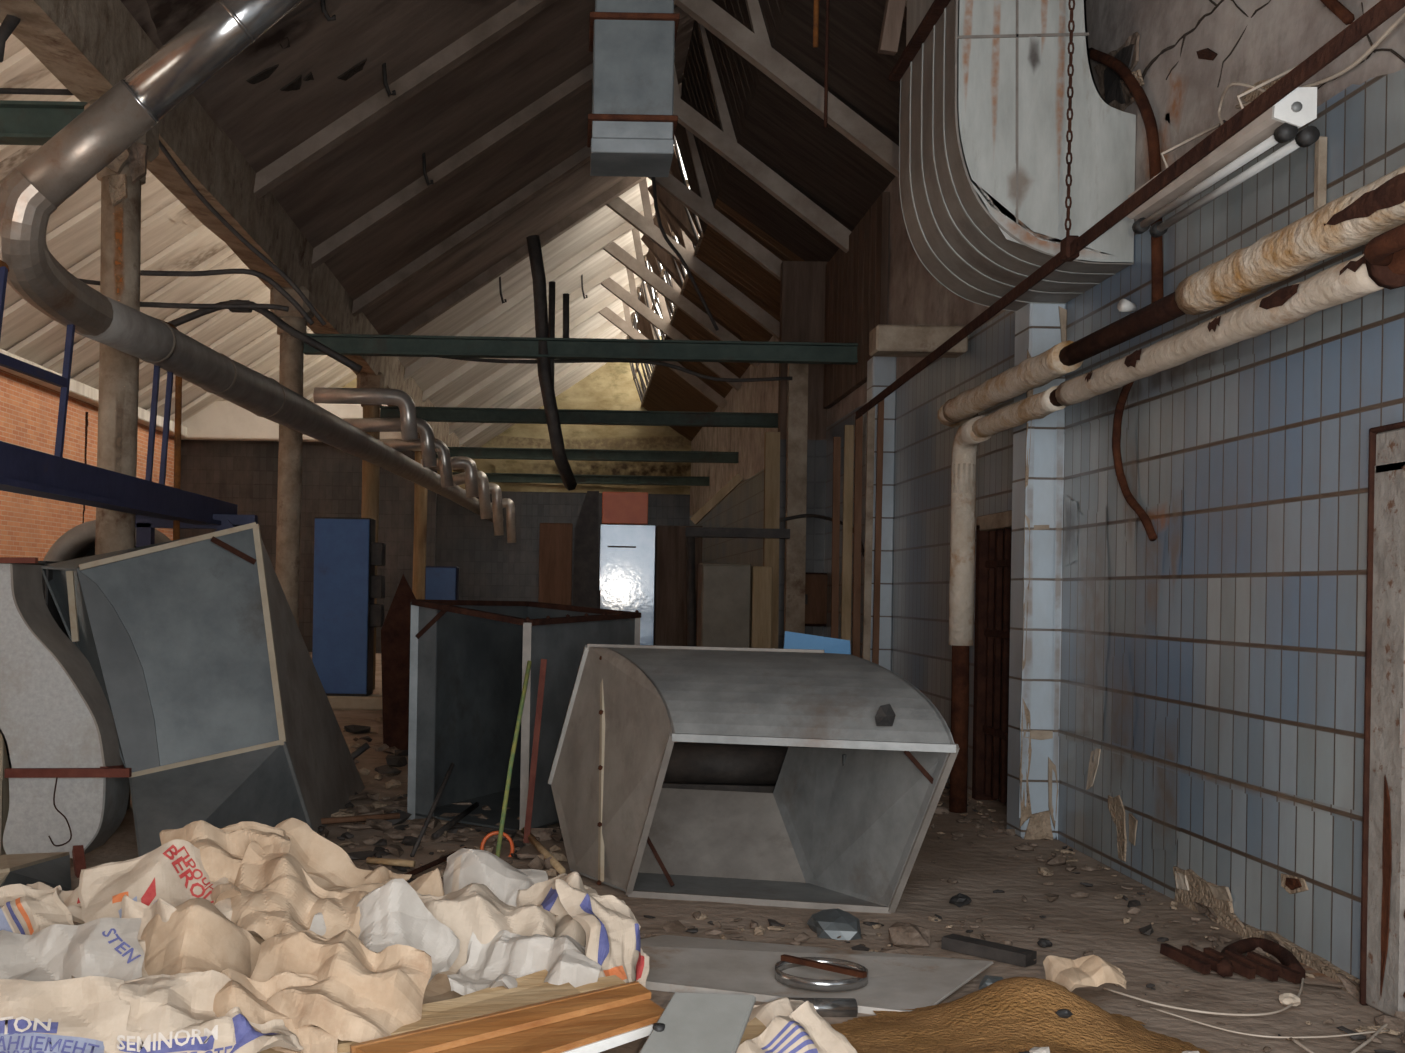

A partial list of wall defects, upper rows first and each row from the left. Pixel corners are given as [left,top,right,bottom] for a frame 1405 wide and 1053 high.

crack [1142,0,1271,87]
rust [114,211,123,295]
spalling [1173,866,1360,1000]
peeling [1380,775,1405,996]